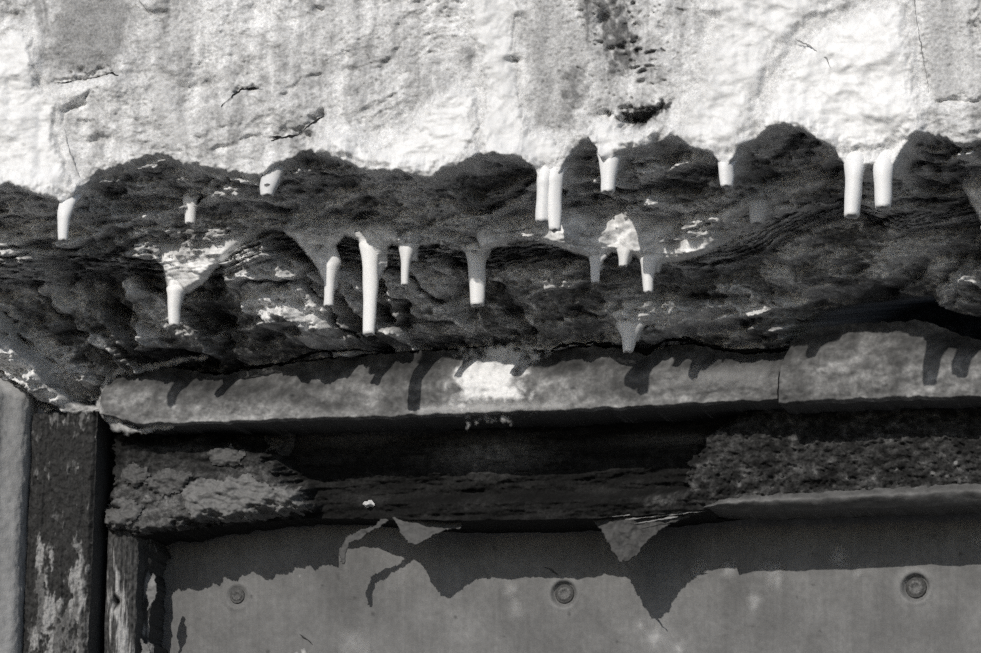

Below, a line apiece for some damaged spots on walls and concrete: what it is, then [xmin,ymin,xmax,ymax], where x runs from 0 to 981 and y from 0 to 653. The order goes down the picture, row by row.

leakage [583,0,639,75]
crack [914,0,929,91]
crack [221,87,258,107]
crack [271,116,324,141]
leakage [587,112,653,162]
crack [220,349,395,373]
peeling [121,443,312,525]
peeling [105,496,144,531]